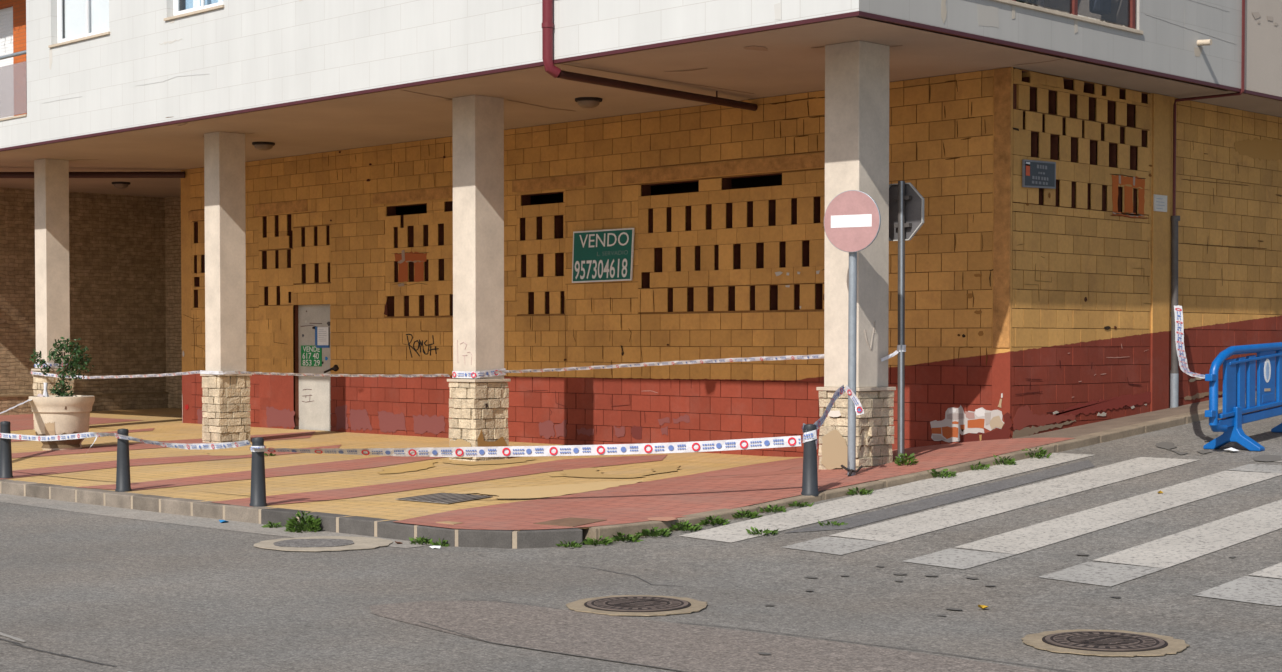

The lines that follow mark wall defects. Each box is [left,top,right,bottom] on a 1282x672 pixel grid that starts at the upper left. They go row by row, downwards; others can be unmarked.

peeling [930,393,1004,442]